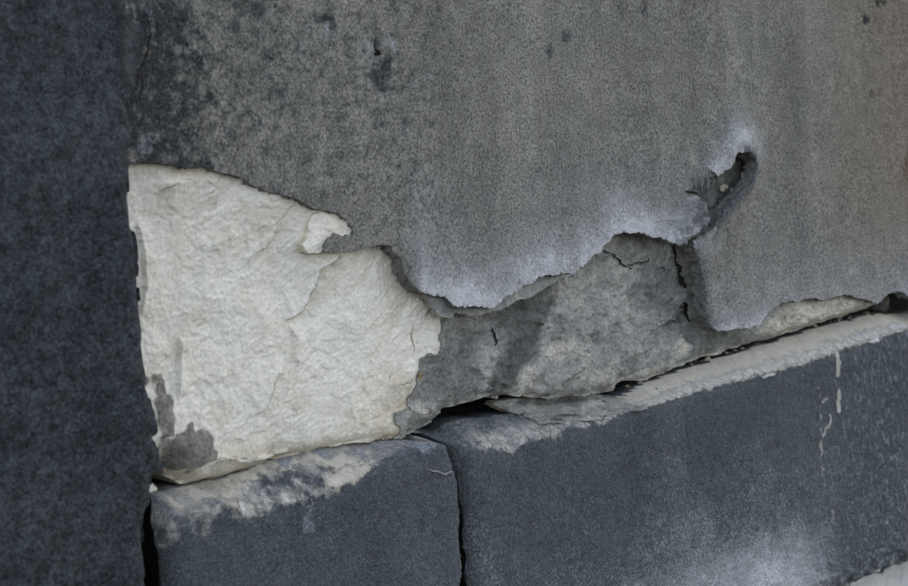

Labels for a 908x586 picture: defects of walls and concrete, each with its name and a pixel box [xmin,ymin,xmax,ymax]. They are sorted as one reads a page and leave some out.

spalling [127,162,879,492]
damp [819,388,841,475]